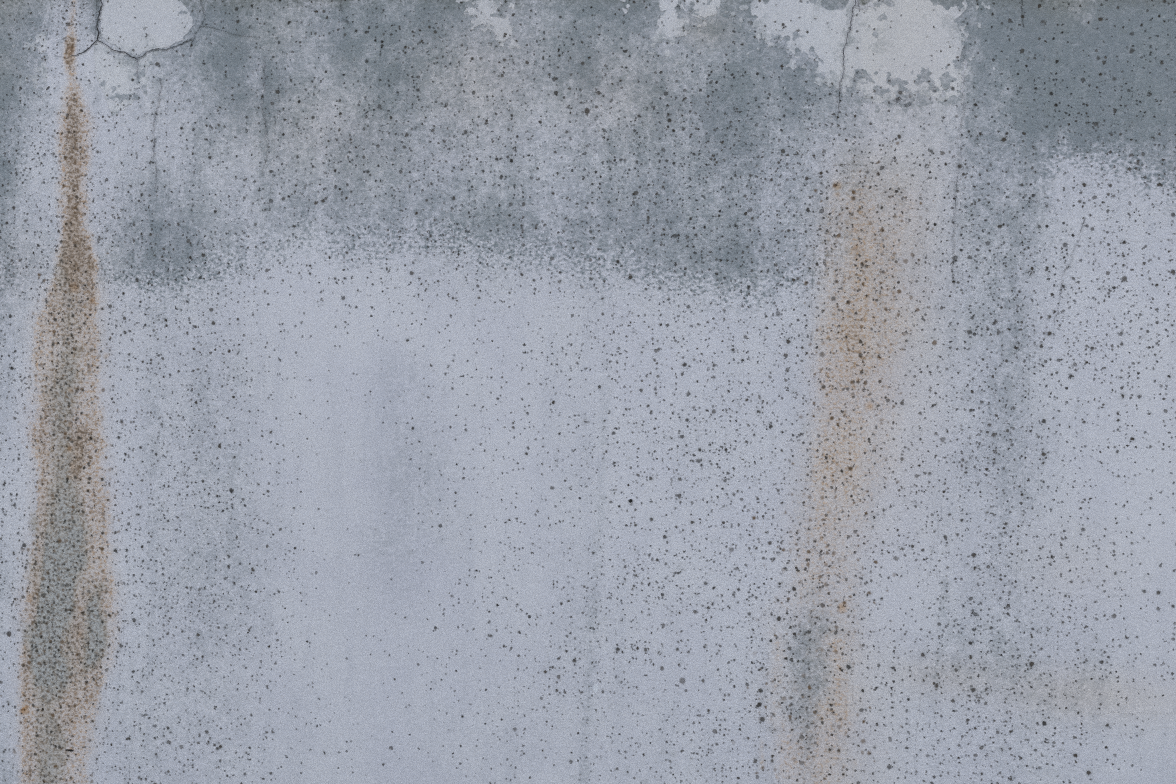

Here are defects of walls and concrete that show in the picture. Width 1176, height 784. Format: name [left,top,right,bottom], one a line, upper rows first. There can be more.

peeling [93,0,193,116]
crack [56,0,268,188]
peeling [456,0,521,49]
peeling [647,0,990,117]
water stain [806,0,874,16]
crack [837,0,860,118]
corrosion [0,0,153,784]
water stain [95,0,863,784]
corrosion [705,90,1000,784]